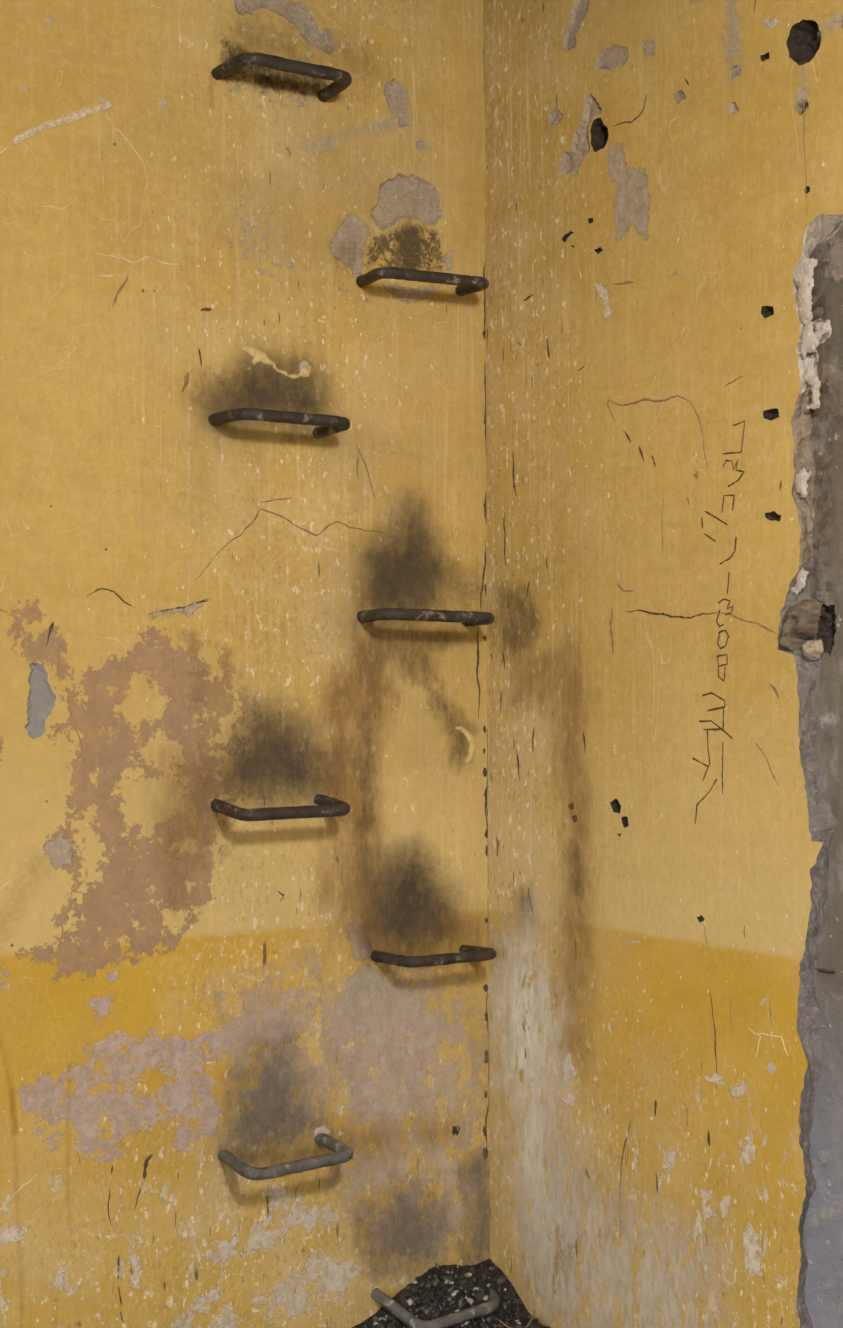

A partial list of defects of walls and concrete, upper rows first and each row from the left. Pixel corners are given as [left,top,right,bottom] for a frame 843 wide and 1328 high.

flaking render [234,0,337,54]
flaking render [594,39,656,72]
flaking render [330,173,449,294]
flaking render [381,281,437,303]
peeling [240,345,312,378]
crack [86,443,384,620]
peeling [455,726,476,764]
flaking render [499,78,843,1328]
peeling [7,596,300,1165]
peeling [313,921,447,1138]
peeling [0,1194,37,1272]
peeling [31,1180,363,1328]